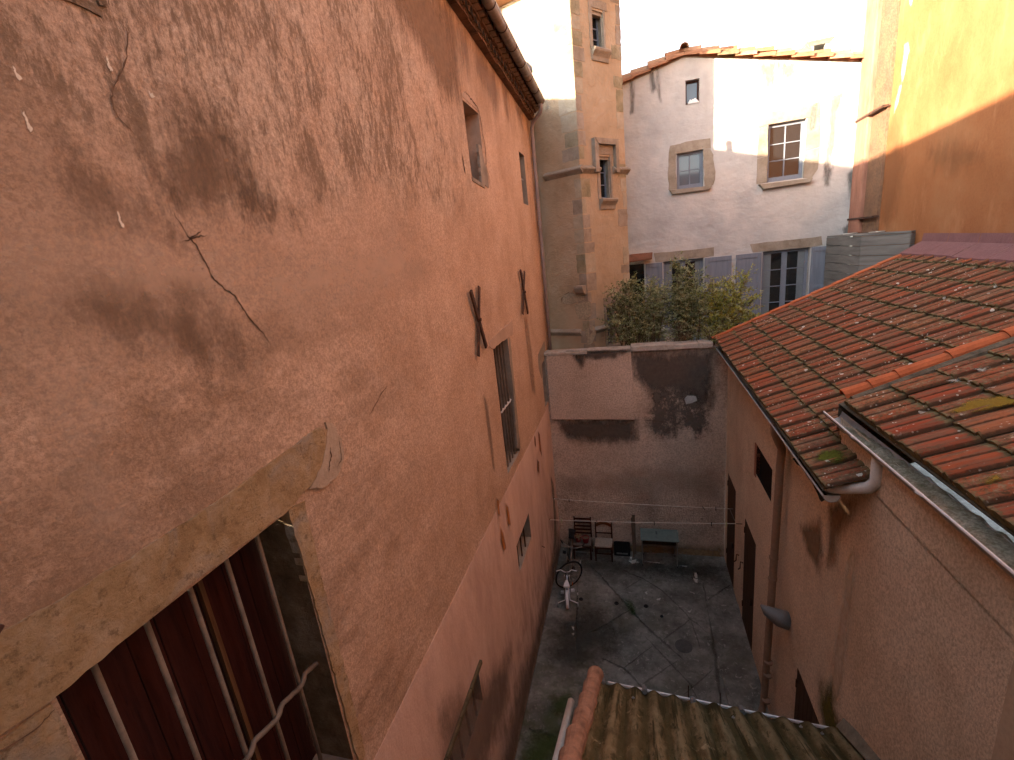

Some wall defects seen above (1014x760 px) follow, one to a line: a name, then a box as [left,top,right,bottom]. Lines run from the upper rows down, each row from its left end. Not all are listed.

damp [825,93,842,185]
crack [174,213,269,342]
damp [558,350,714,443]